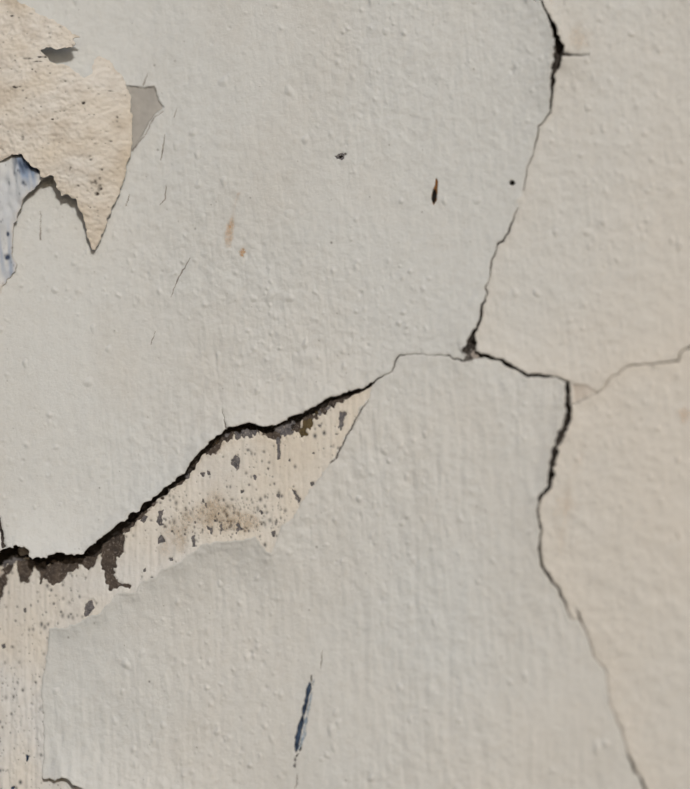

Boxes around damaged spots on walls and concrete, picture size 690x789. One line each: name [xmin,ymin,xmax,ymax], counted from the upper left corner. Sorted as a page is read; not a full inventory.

peeling [0,0,163,294]
crack [523,0,590,191]
peeling [0,386,372,789]
crack [0,207,690,789]